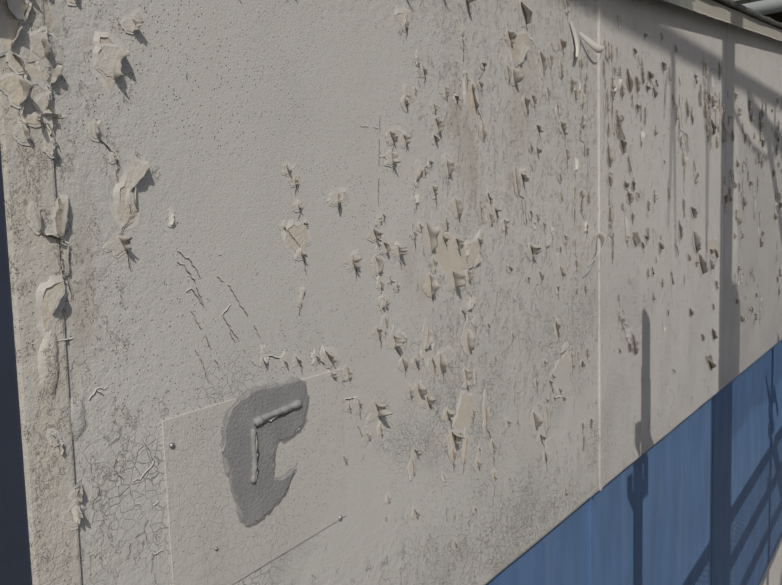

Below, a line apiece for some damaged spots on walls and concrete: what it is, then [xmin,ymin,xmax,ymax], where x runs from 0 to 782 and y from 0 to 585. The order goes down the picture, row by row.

peeling [0,0,68,159]
peeling [26,194,74,338]
crack [85,386,108,426]
peeling [90,31,130,97]
peeling [86,119,152,271]
crack [177,249,260,383]
peeling [343,0,510,485]
peeling [529,318,590,463]
peeling [618,294,639,356]
peeling [504,0,782,302]
peeling [705,353,717,371]
crack [103,425,164,585]